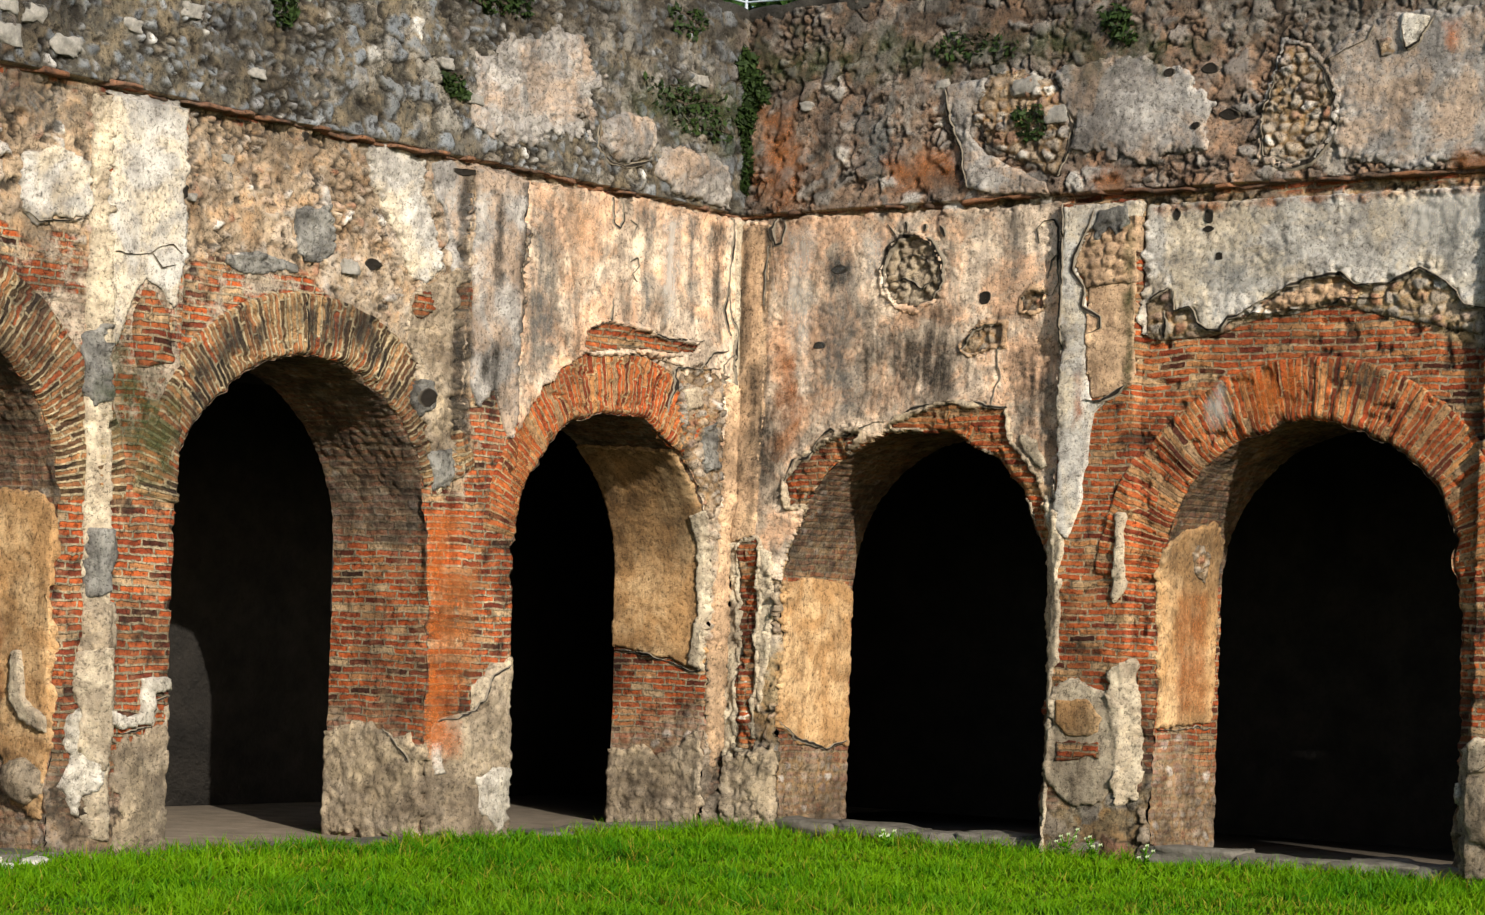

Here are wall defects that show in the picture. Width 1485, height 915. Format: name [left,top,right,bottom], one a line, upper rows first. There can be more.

water stain [457,177,474,261]
water stain [451,287,501,425]
water stain [495,200,553,366]
water stain [644,214,724,314]
water stain [740,228,808,484]
water stain [864,332,958,397]
spalling [1069,205,1485,341]
peeling [7,93,175,857]
peeling [582,298,775,823]
peeling [780,284,1145,854]
peeling [420,657,514,840]
peeling [1456,737,1485,880]